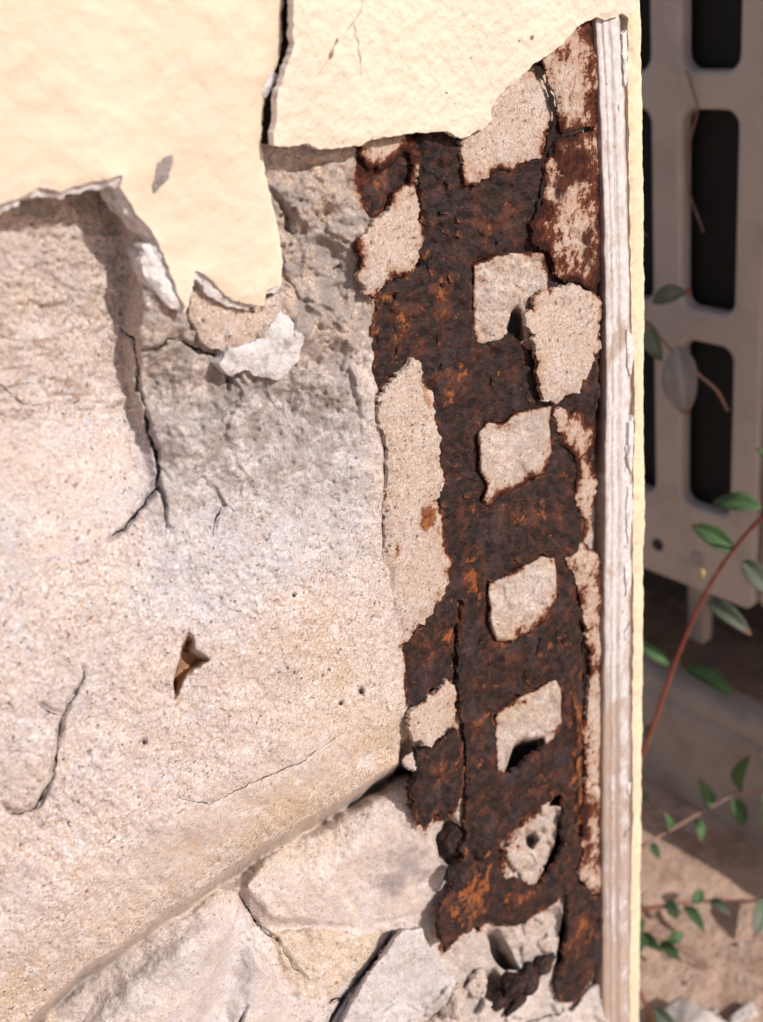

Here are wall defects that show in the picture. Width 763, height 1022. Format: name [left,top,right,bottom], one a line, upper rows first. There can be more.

crack [261,0,289,145]
flaking render [0,0,638,603]
crack [107,331,235,541]
crack [3,668,85,815]
crack [178,734,341,805]
corrosion [362,131,603,1003]
spalling [485,554,557,644]
spalling [493,679,562,773]
spalling [578,619,588,721]
crack [239,893,306,980]
spalling [29,740,610,1022]
crack [328,936,391,1022]